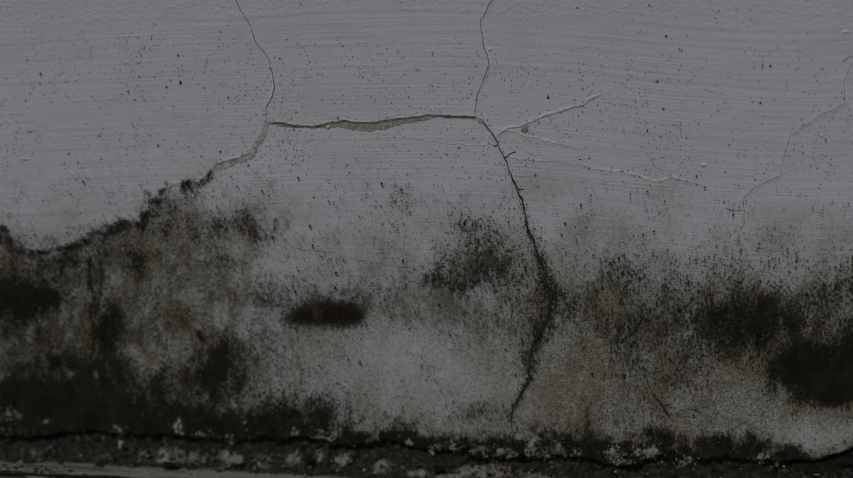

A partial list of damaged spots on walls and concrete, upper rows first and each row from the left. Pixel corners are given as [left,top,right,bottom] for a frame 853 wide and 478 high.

crack [234,0,275,121]
crack [726,56,853,250]
crack [474,0,603,425]
flaking render [173,417,235,444]
flaking render [428,431,582,464]
flaking render [598,439,719,467]
flaking render [743,446,853,478]